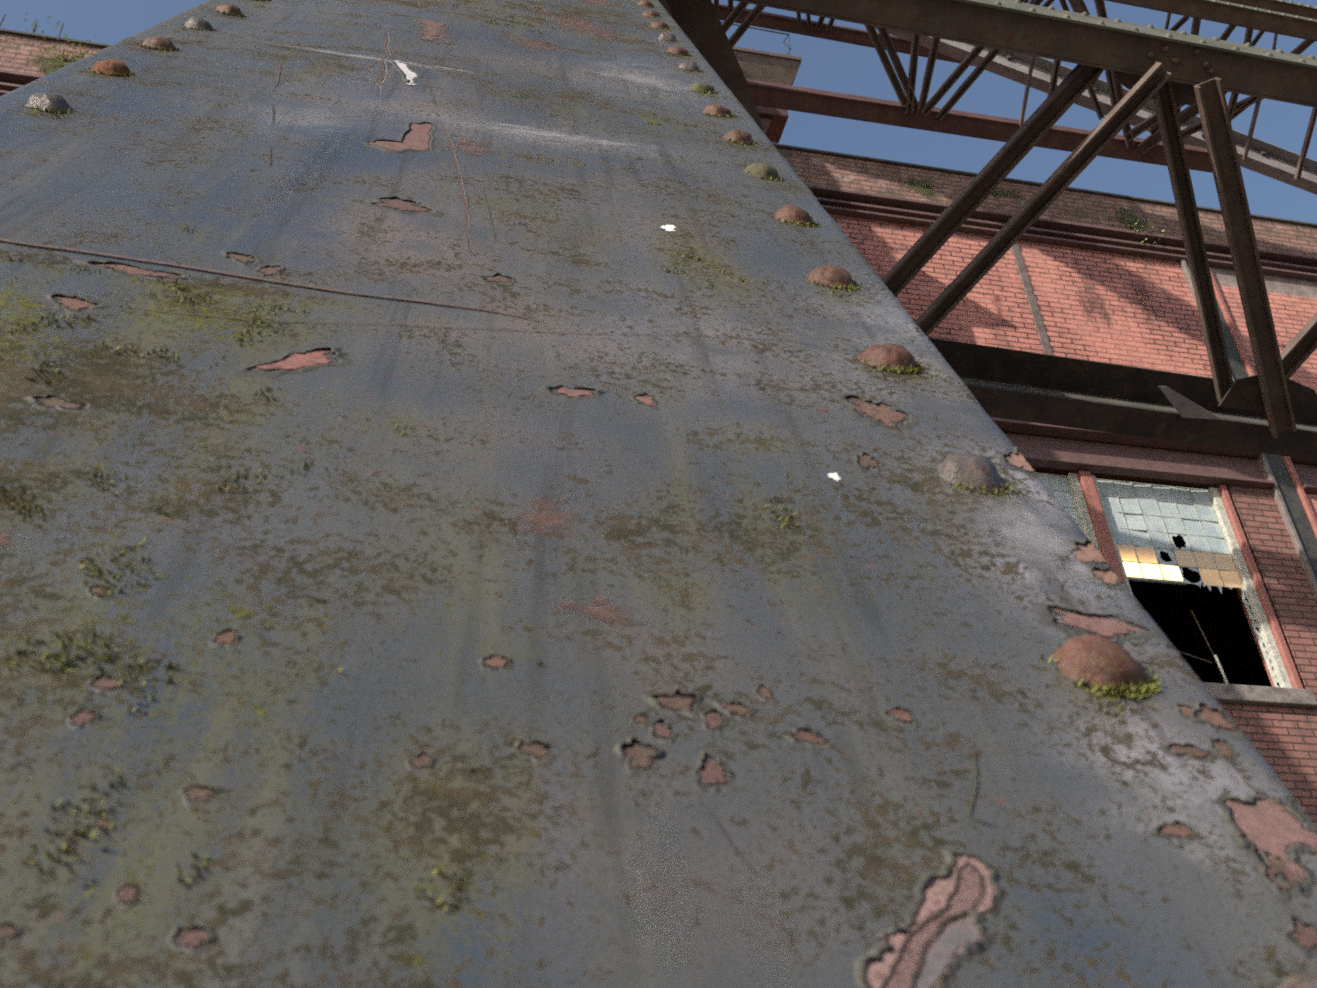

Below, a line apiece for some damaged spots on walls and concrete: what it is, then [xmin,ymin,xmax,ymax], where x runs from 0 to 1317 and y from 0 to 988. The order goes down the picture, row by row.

peeling [363,122,438,153]
corrosion [71,260,206,284]
corrosion [220,251,287,279]
corrosion [43,293,110,316]
peeling [1057,538,1125,591]
peeling [1029,602,1165,647]
peeling [1214,791,1317,899]
peeling [853,849,1004,988]